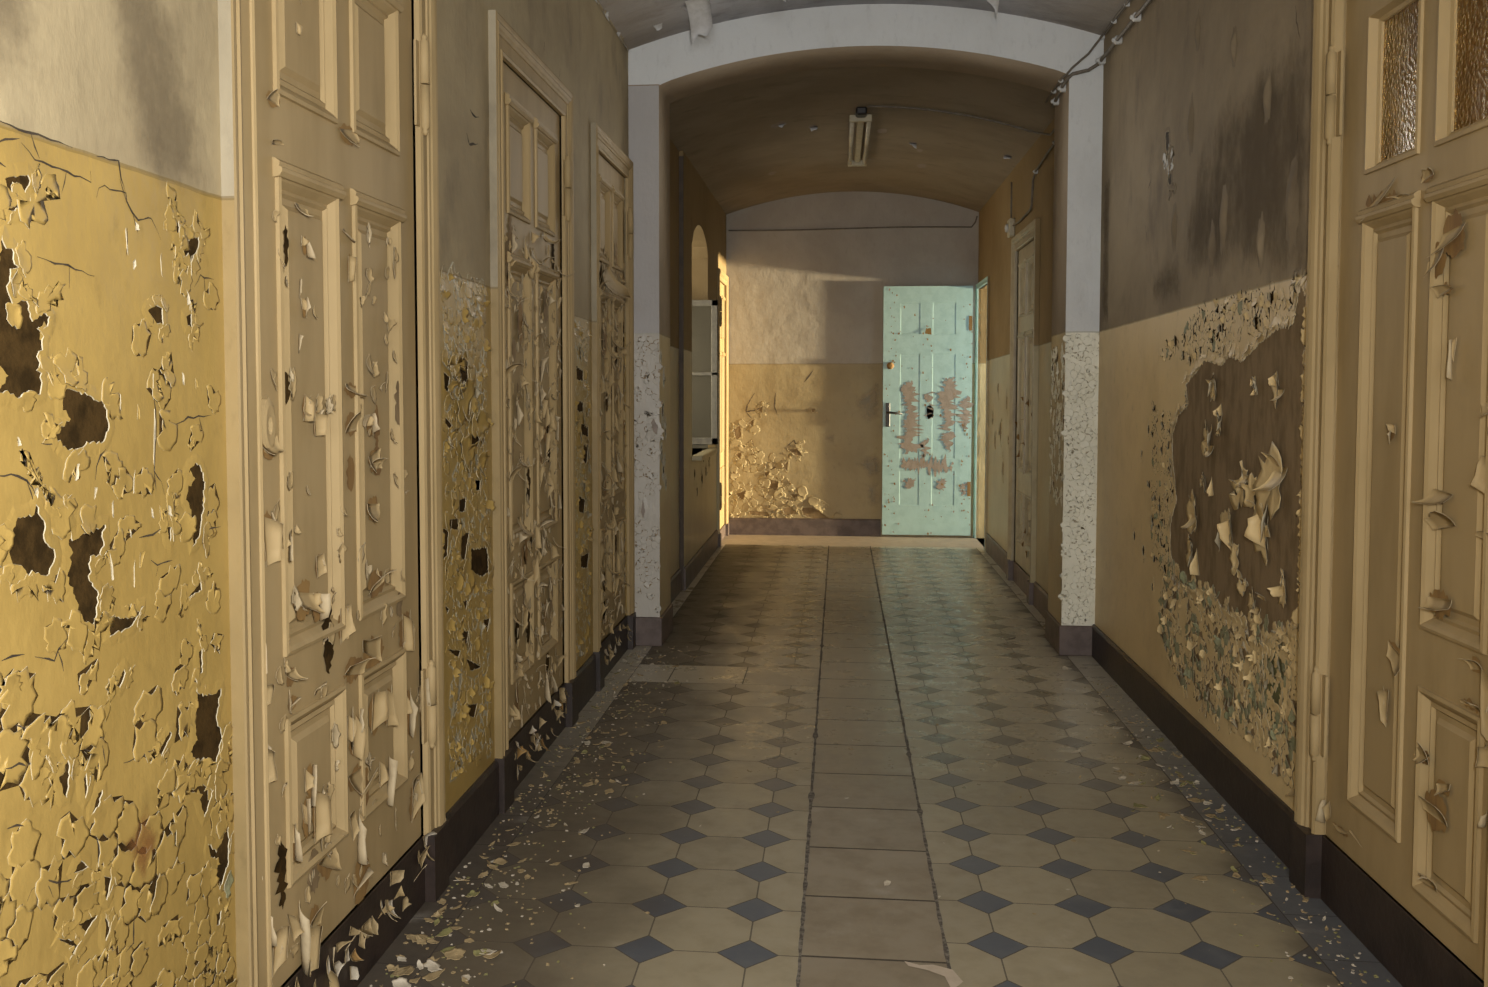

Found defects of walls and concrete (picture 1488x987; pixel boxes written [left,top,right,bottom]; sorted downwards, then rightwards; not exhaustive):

peeling [680,0,713,44]
crack [0,121,160,255]
leakage [1195,93,1296,245]
crack [37,256,92,289]
peeling [141,183,210,349]
peeling [0,162,198,722]
peeling [728,401,843,519]
peeling [1168,268,1307,753]
peeling [150,453,235,934]
peeling [17,724,108,825]
peeling [49,849,123,971]
peeling [295,831,466,987]